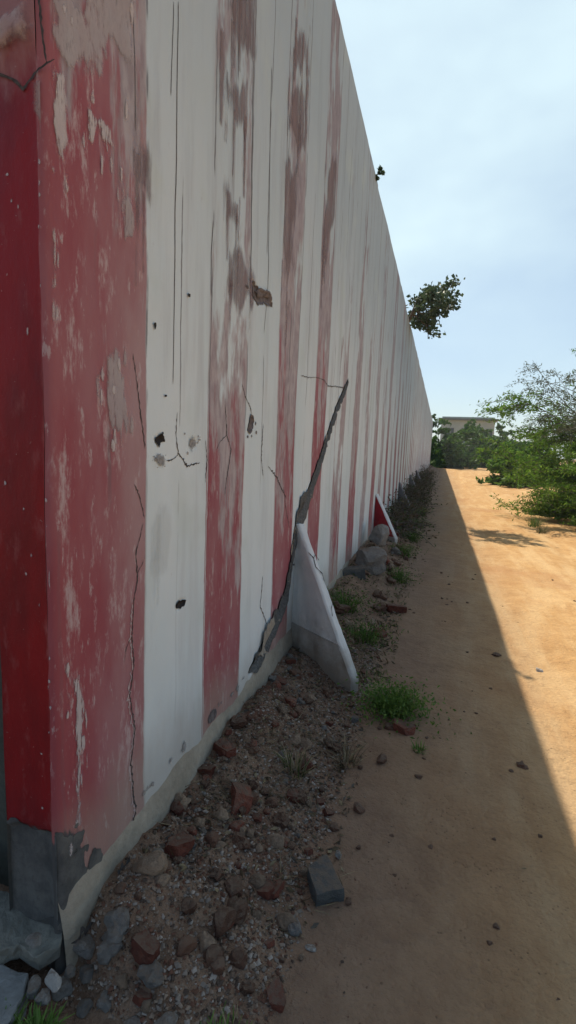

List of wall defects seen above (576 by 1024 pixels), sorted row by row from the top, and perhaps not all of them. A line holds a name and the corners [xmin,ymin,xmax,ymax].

crack [0,0,54,91]
peeling [53,0,134,159]
peeling [82,94,134,237]
spalling [246,281,273,307]
crack [167,375,349,673]
crack [125,486,144,821]
flaking render [7,663,103,932]